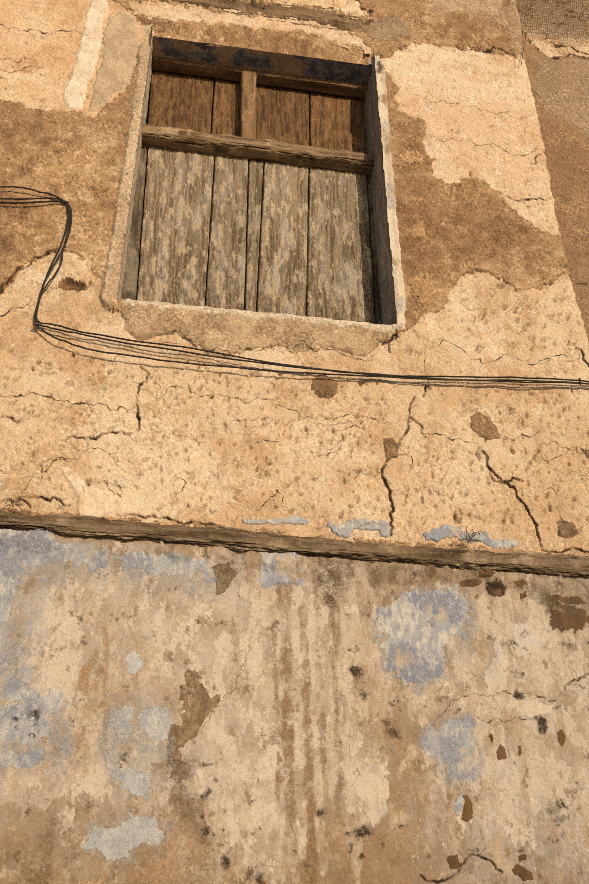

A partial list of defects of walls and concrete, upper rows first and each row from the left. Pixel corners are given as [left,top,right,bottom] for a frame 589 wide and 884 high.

spalling [0,0,561,237]
crack [0,374,149,426]
spalling [0,251,589,554]
crack [23,432,119,505]
crack [371,385,467,532]
crack [485,454,589,553]
leakage [318,558,354,604]
peeling [0,528,221,778]
peeling [481,594,589,718]
leakage [535,716,548,733]
leakage [183,779,224,844]
leakage [347,825,370,859]